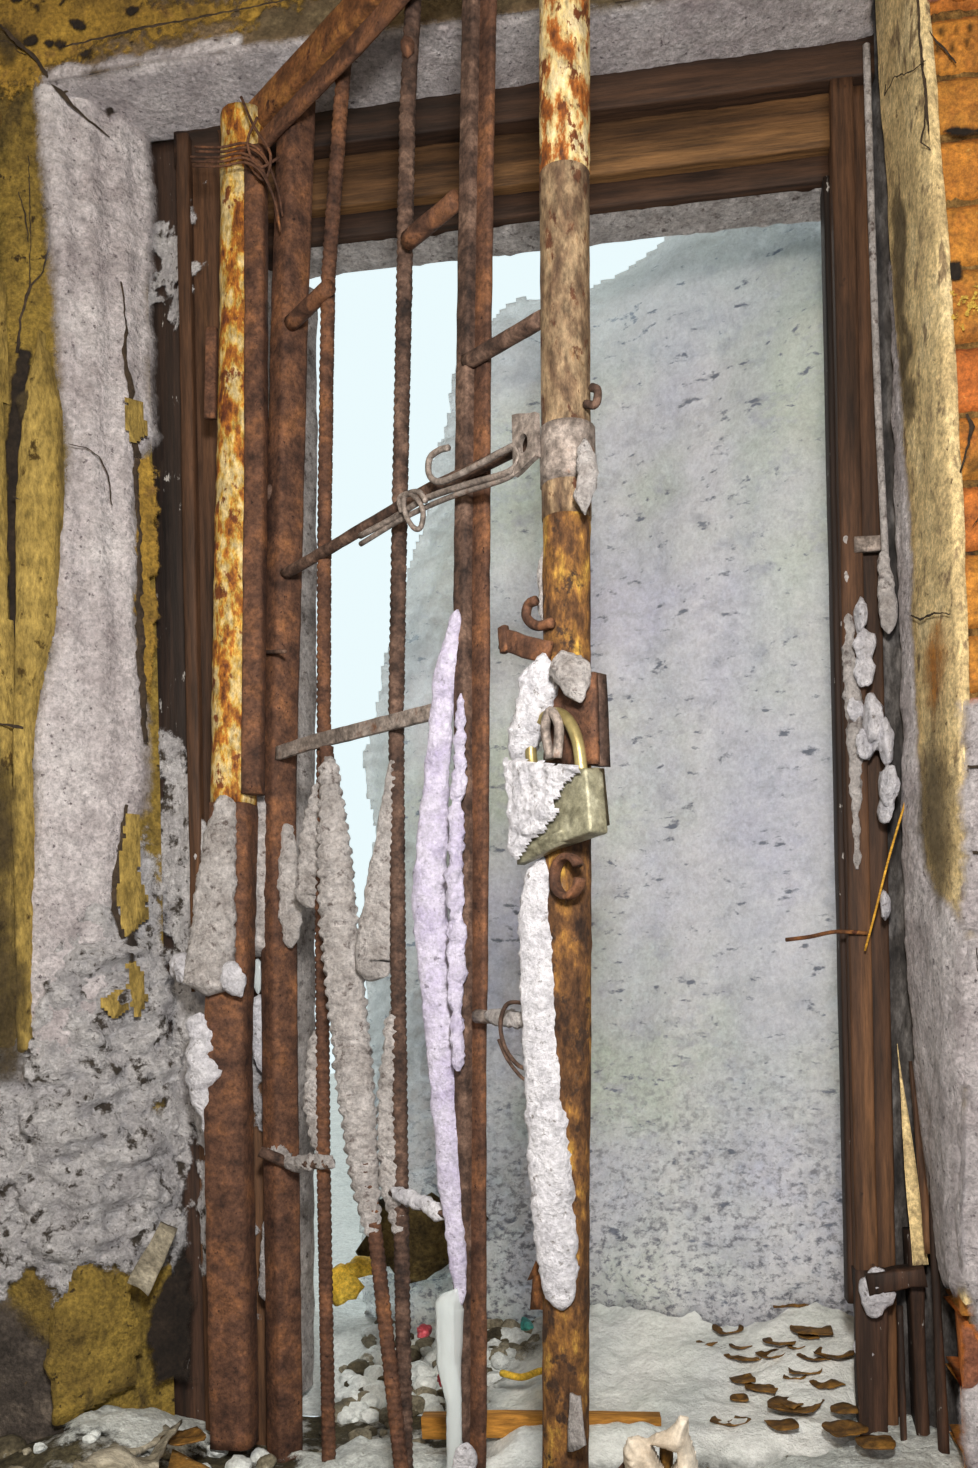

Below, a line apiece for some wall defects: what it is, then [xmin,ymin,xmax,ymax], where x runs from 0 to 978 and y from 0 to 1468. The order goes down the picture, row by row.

spalling [120,281,160,742]
flaking render [100,804,149,1018]
spalling [43,1221,195,1426]